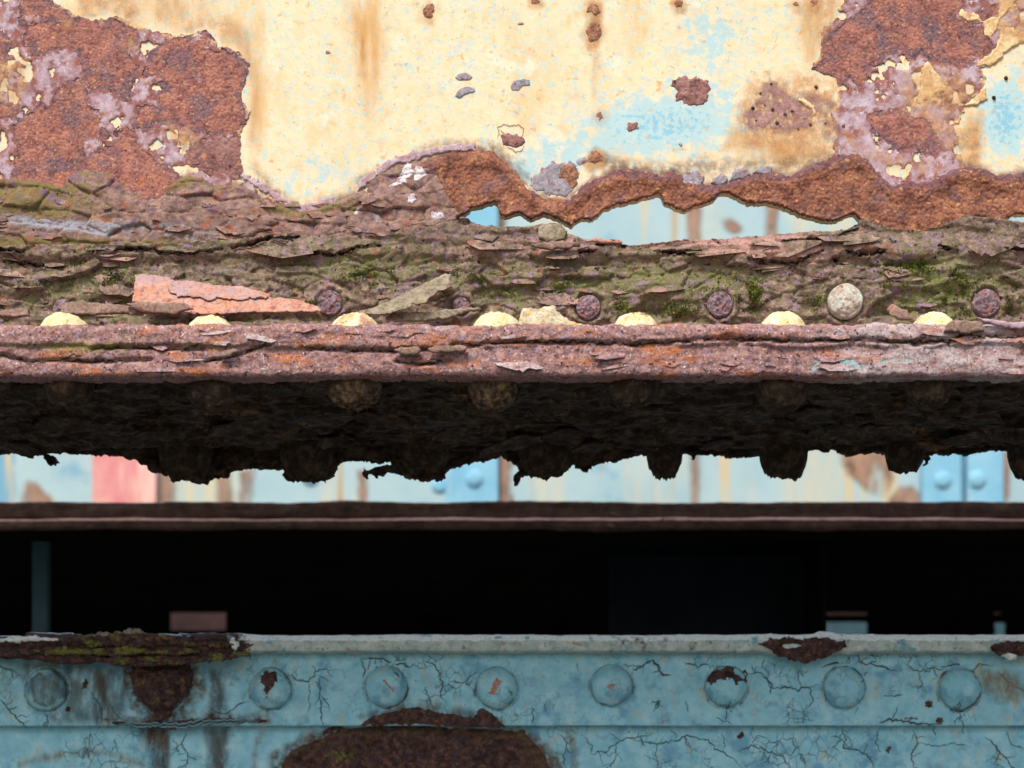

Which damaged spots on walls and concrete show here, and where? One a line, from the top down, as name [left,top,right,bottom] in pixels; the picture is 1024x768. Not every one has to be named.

corrosion [0,0,1024,246]
peeling [530,157,588,197]
peeling [682,165,772,187]
corrosion [845,453,920,502]
corrosion [758,636,847,664]
corrosion [990,640,1024,661]
crack [0,666,267,768]
crack [291,666,335,729]
corrosion [272,707,562,768]
crack [360,657,477,708]
corrosion [707,666,748,688]
crack [559,655,1024,768]